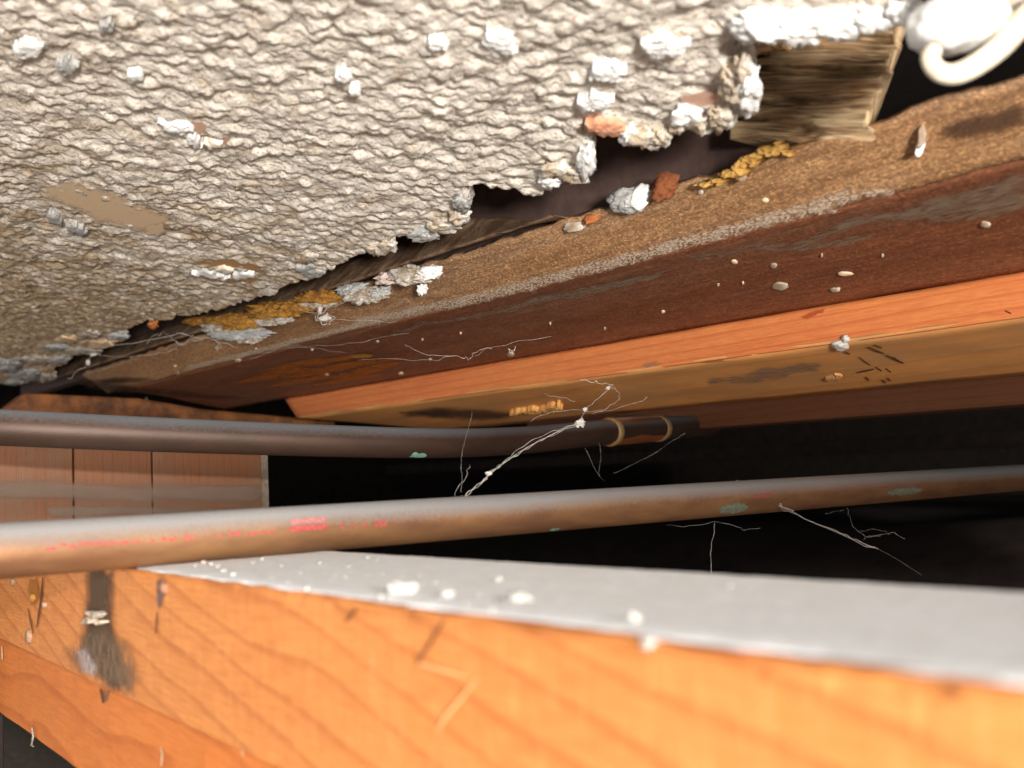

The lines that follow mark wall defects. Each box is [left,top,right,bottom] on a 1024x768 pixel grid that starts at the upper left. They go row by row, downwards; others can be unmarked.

peeling [157,117,230,150]
peeling [46,206,88,236]
spalling [365,193,473,257]
peeling [191,265,255,282]
peeling [292,252,326,279]
spalling [0,328,131,386]
leakage [73,571,134,691]